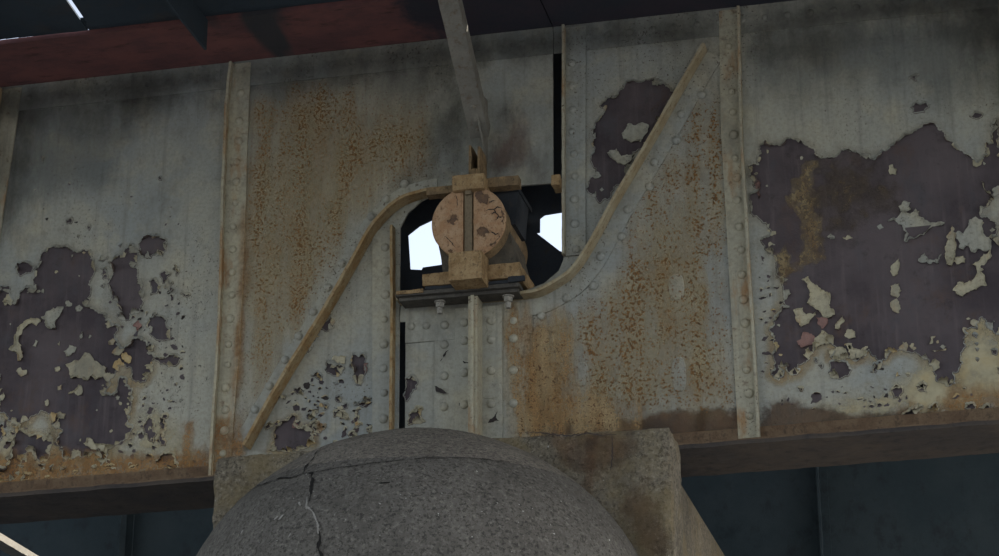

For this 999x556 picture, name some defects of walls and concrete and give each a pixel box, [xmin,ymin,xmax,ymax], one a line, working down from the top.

peeling [586,77,674,204]
peeling [748,101,999,415]
peeling [0,216,191,482]
corrosion [0,414,243,482]
peeling [264,352,372,454]
crack [247,448,517,501]
peeling [403,374,426,426]
corrosion [505,304,738,437]
corrosion [760,322,999,426]
crack [316,531,324,556]